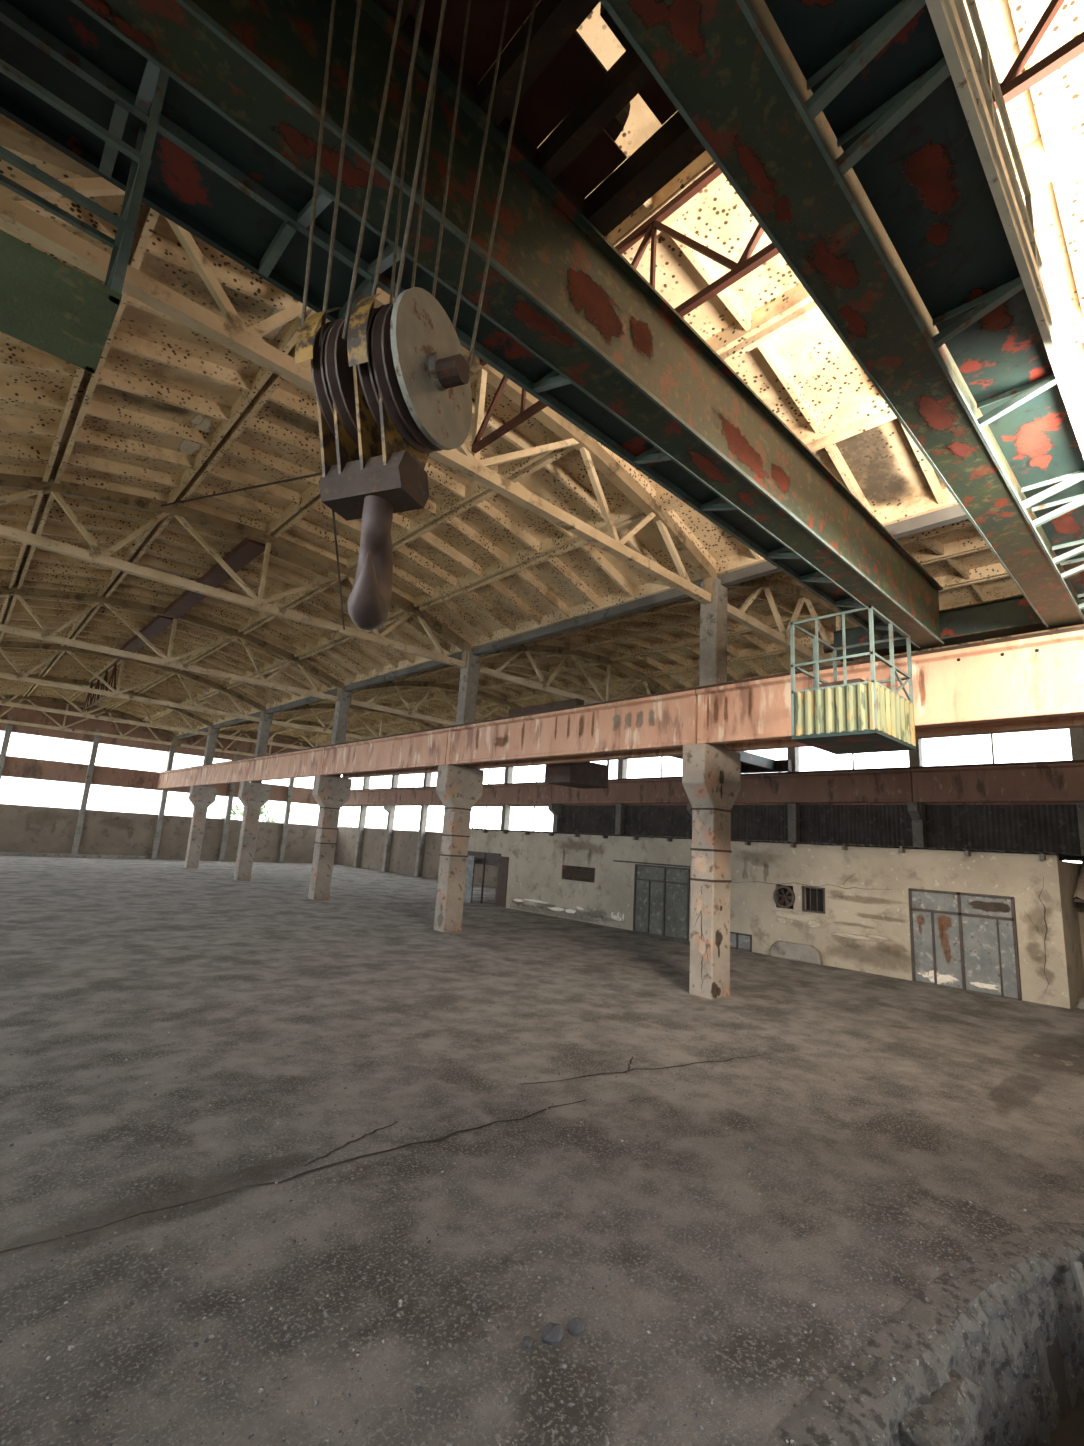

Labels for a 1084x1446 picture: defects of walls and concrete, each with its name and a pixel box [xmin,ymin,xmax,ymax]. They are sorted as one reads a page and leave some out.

rust [80,0,155,51]
rust [627,0,704,56]
rust [271,122,369,189]
rust [901,139,960,247]
rust [567,268,653,360]
rust [965,287,1013,332]
rust [714,411,790,493]
rust [917,395,972,458]
rust [496,723,525,746]
rust [555,713,594,738]
rust [707,697,728,725]
rust [917,915,951,963]